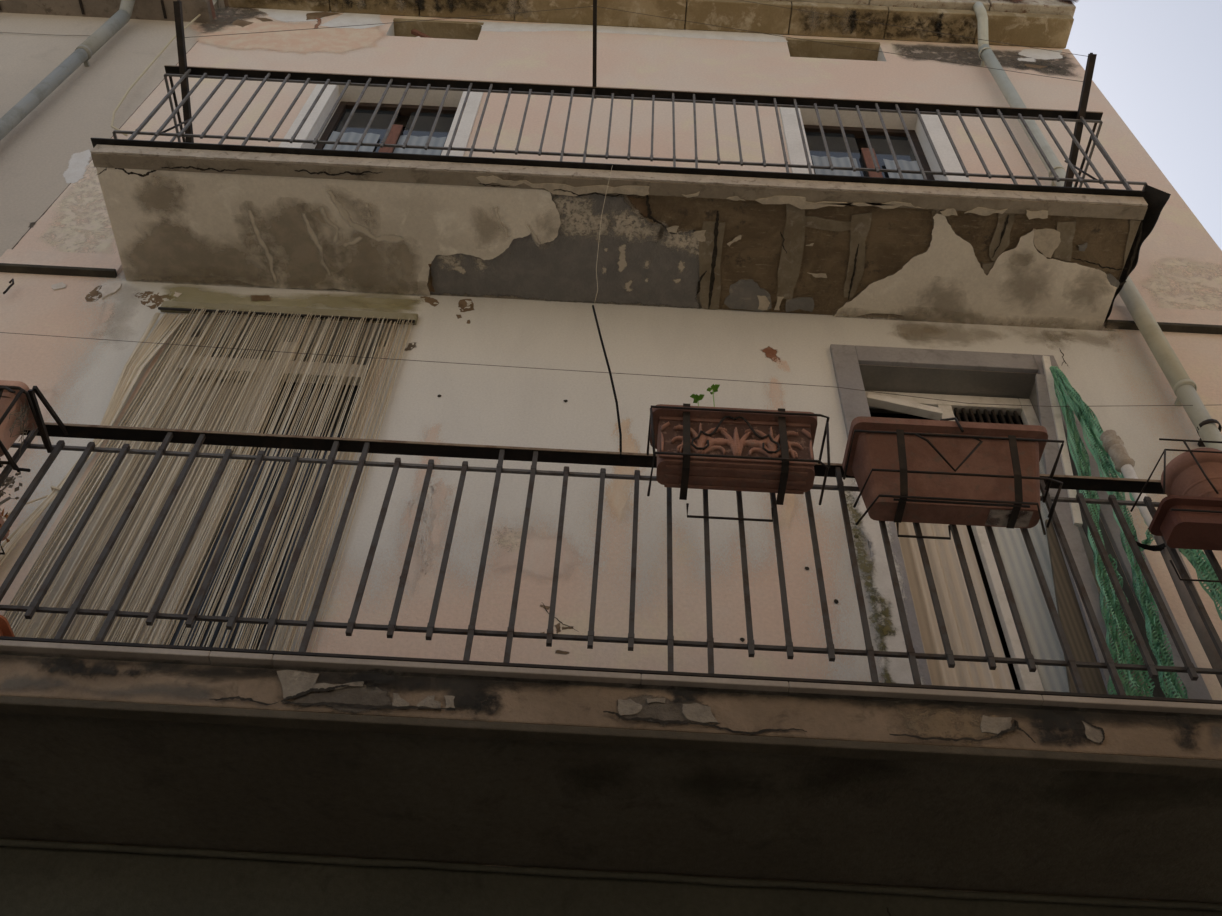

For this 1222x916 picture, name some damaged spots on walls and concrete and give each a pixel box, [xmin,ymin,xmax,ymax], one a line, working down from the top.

crack [97,166,250,177]
crack [295,168,381,176]
peeling [28,149,116,255]
leakage [129,176,420,313]
corrosion [761,346,790,410]
peeling [0,175,1200,685]
spalling [277,670,455,713]
spalling [617,695,718,727]
spalling [899,707,1012,745]
spalling [1082,721,1105,744]